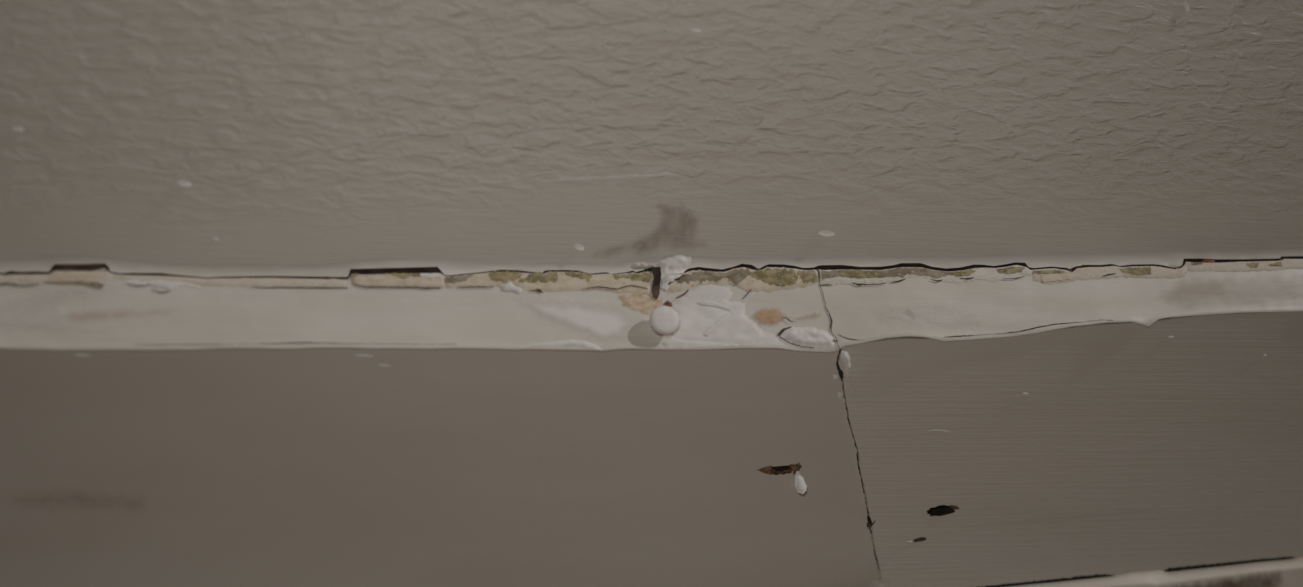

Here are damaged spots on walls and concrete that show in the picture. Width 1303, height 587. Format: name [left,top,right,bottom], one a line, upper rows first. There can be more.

crack [0,263,652,279]
peeling [0,259,1303,315]
peeling [778,326,835,349]
crack [684,256,1303,587]
water stain [1196,578,1278,587]